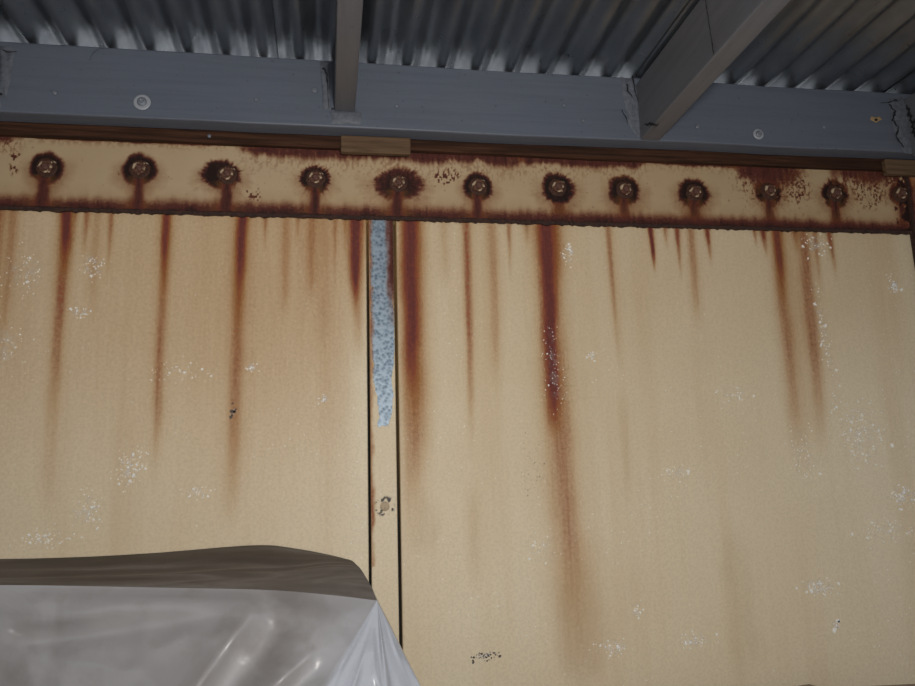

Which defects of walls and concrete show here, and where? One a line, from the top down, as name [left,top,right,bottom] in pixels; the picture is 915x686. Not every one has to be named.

rust [0,137,20,174]
crack [882,99,915,147]
peeling [369,220,394,427]
rust [0,147,915,544]